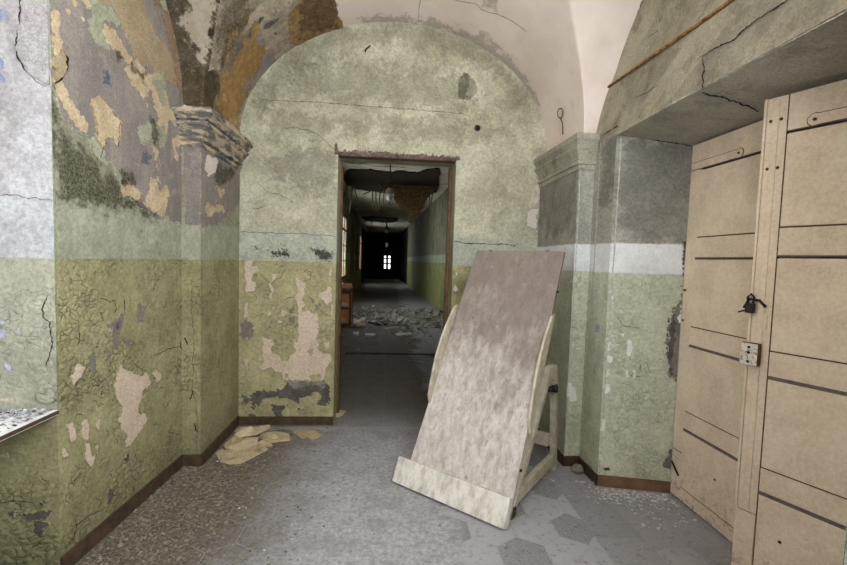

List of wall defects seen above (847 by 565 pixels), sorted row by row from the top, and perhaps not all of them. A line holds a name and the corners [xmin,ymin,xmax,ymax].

crack [15,0,44,86]
crack [698,0,787,112]
peeling [48,0,240,228]
crack [41,295,53,364]
peeling [60,417,102,468]
peeling [69,354,96,385]
peeling [113,363,163,464]
crack [132,276,198,452]
peeling [239,258,335,417]
flaking render [663,449,672,469]
flaking render [663,241,686,382]
crack [65,499,104,550]